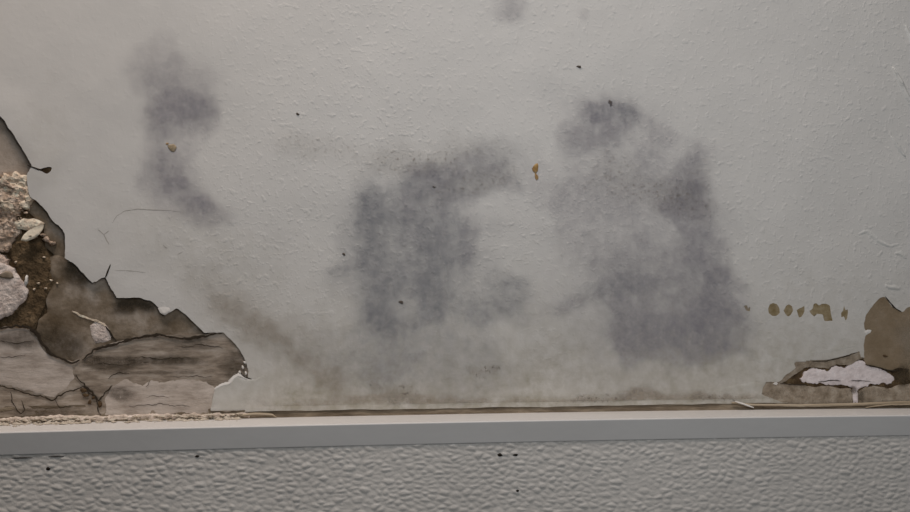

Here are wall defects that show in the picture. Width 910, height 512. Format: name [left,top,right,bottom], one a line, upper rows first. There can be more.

flaking render [0,117,266,423]
peeling [762,296,910,404]